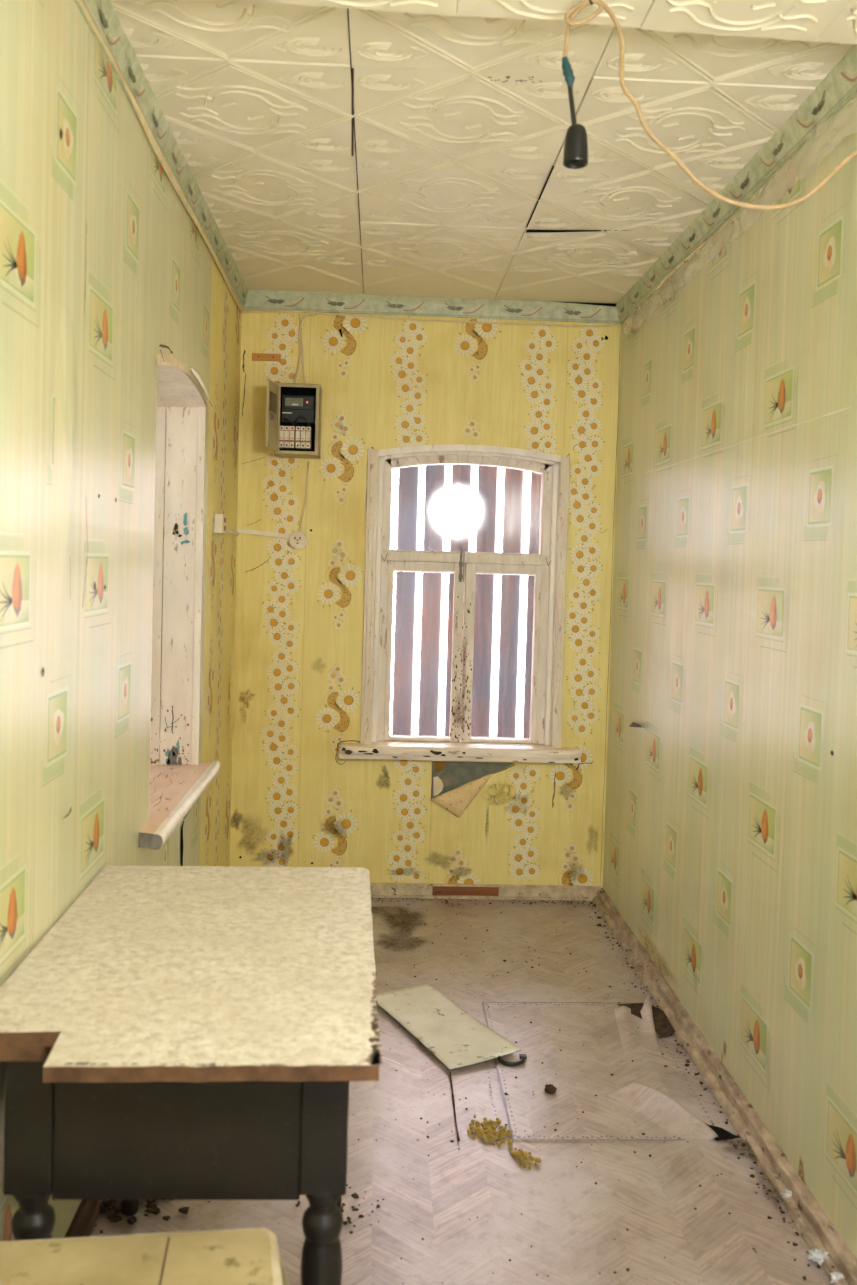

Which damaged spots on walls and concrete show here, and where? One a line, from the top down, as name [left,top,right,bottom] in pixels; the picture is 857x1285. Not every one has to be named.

flaking render [424,596,526,798]